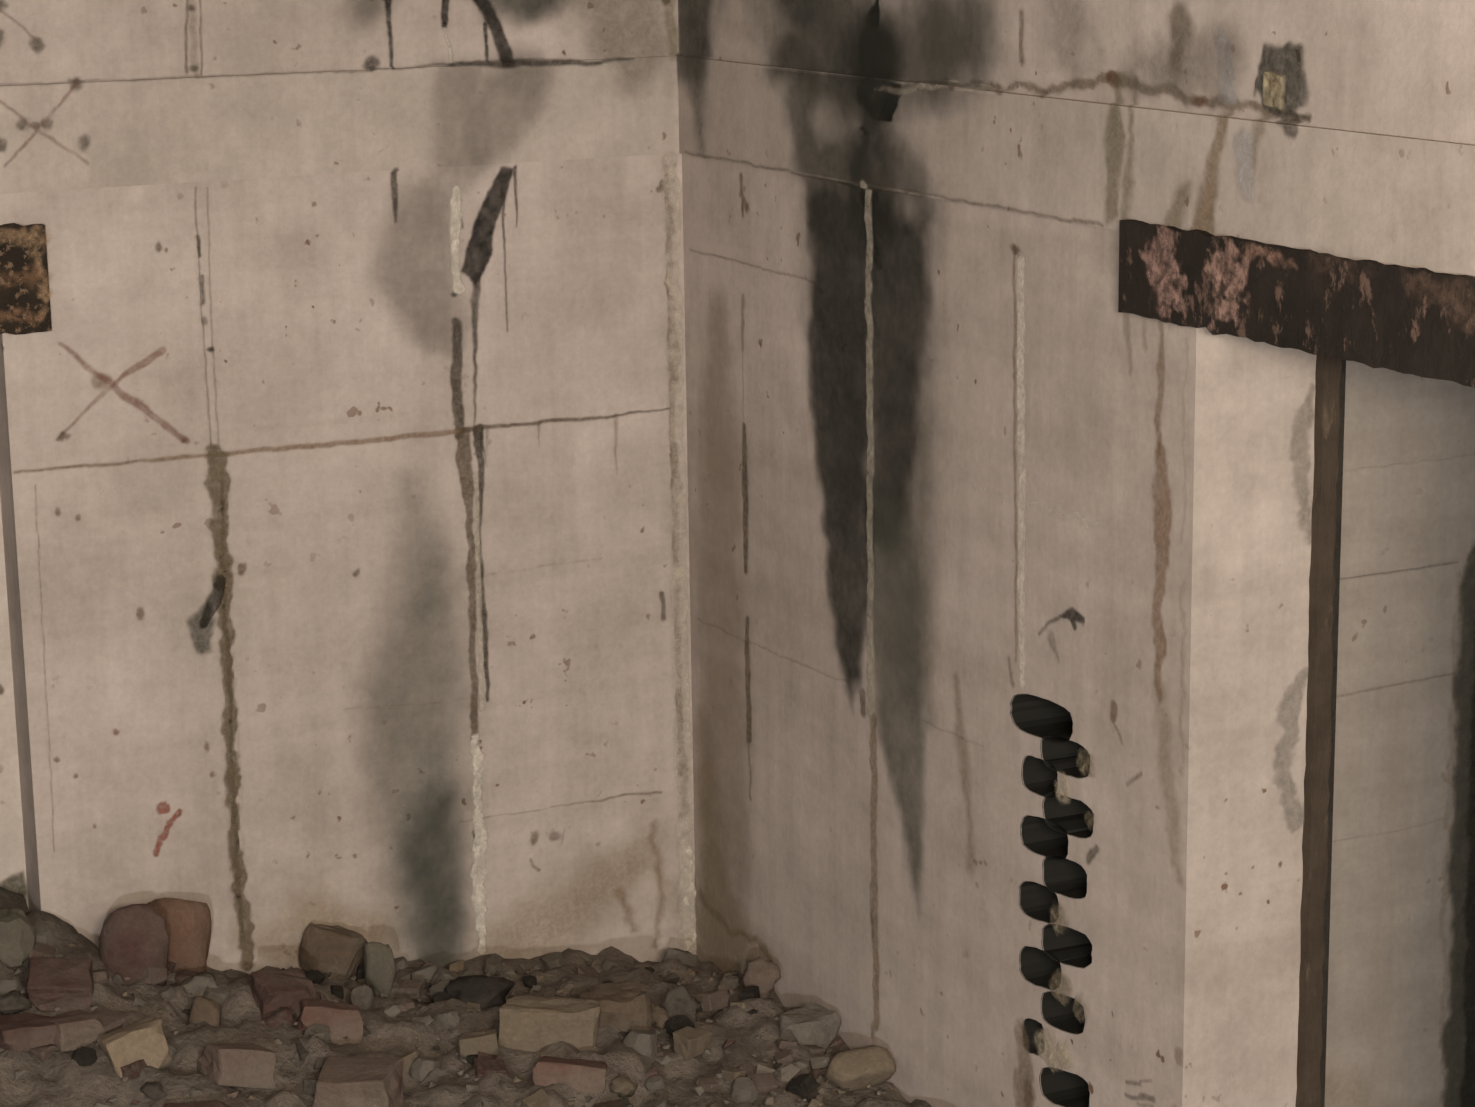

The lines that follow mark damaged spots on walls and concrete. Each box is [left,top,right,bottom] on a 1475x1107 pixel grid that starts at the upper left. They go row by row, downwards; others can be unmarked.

crack [881,60,1304,121]
damp [809,189,924,691]
rust [1154,500,1170,695]